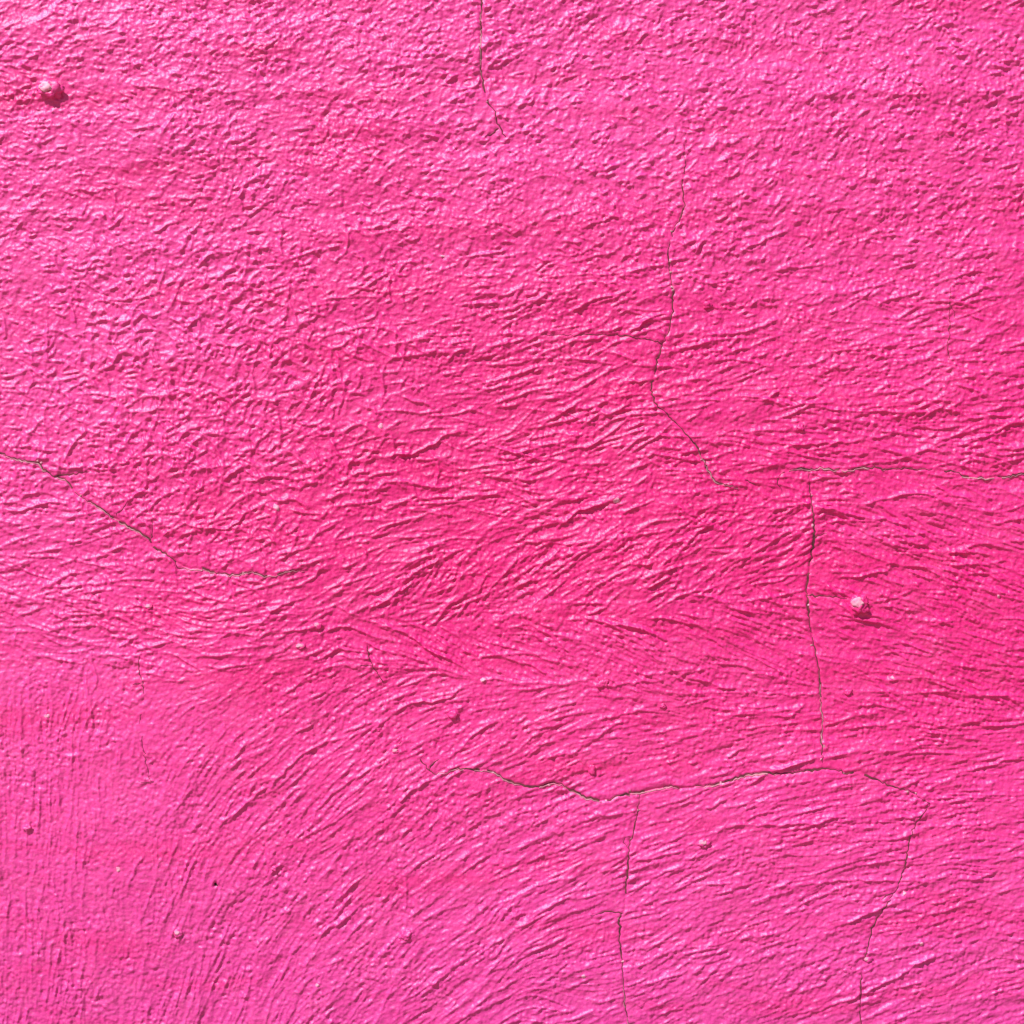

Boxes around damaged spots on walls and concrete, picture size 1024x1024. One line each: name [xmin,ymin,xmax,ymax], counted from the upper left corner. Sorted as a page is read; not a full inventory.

crack [478,0,506,137]
crack [0,452,306,578]
crack [420,148,1024,1024]